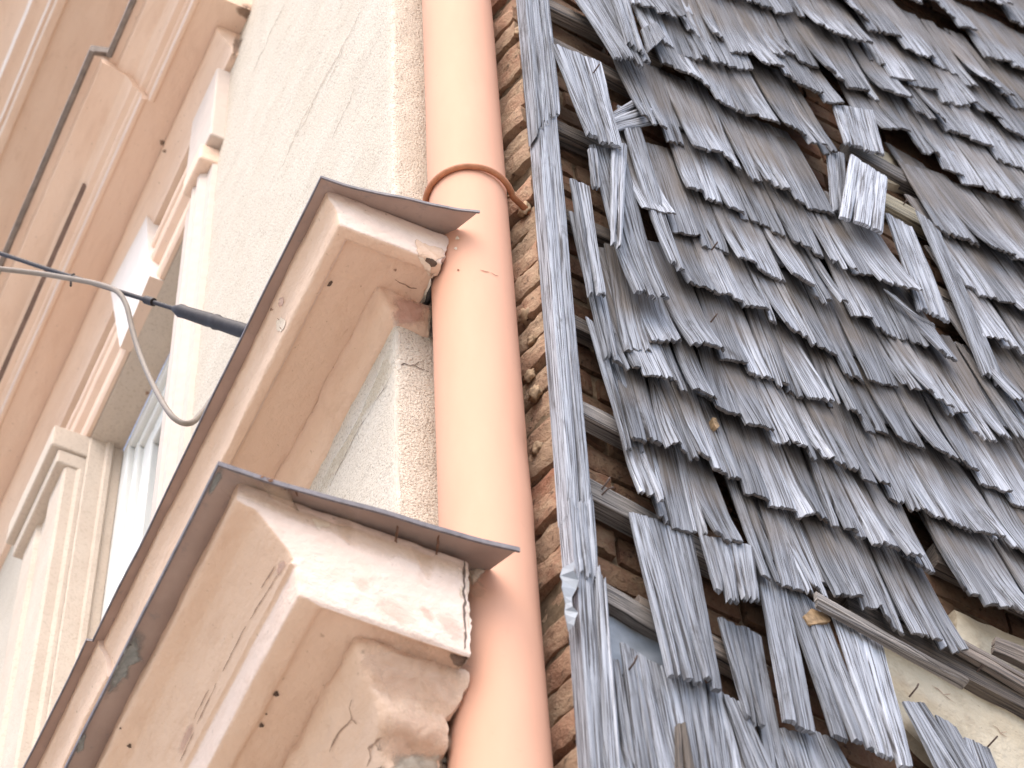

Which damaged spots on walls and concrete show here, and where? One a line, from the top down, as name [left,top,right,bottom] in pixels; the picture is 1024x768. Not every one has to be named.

flaking render [415,239,445,337]
crack [460,562,470,649]
peeling [109,635,140,691]
spalling [450,654,468,667]
crack [329,700,356,752]
crack [367,737,382,766]
spalling [394,752,446,768]